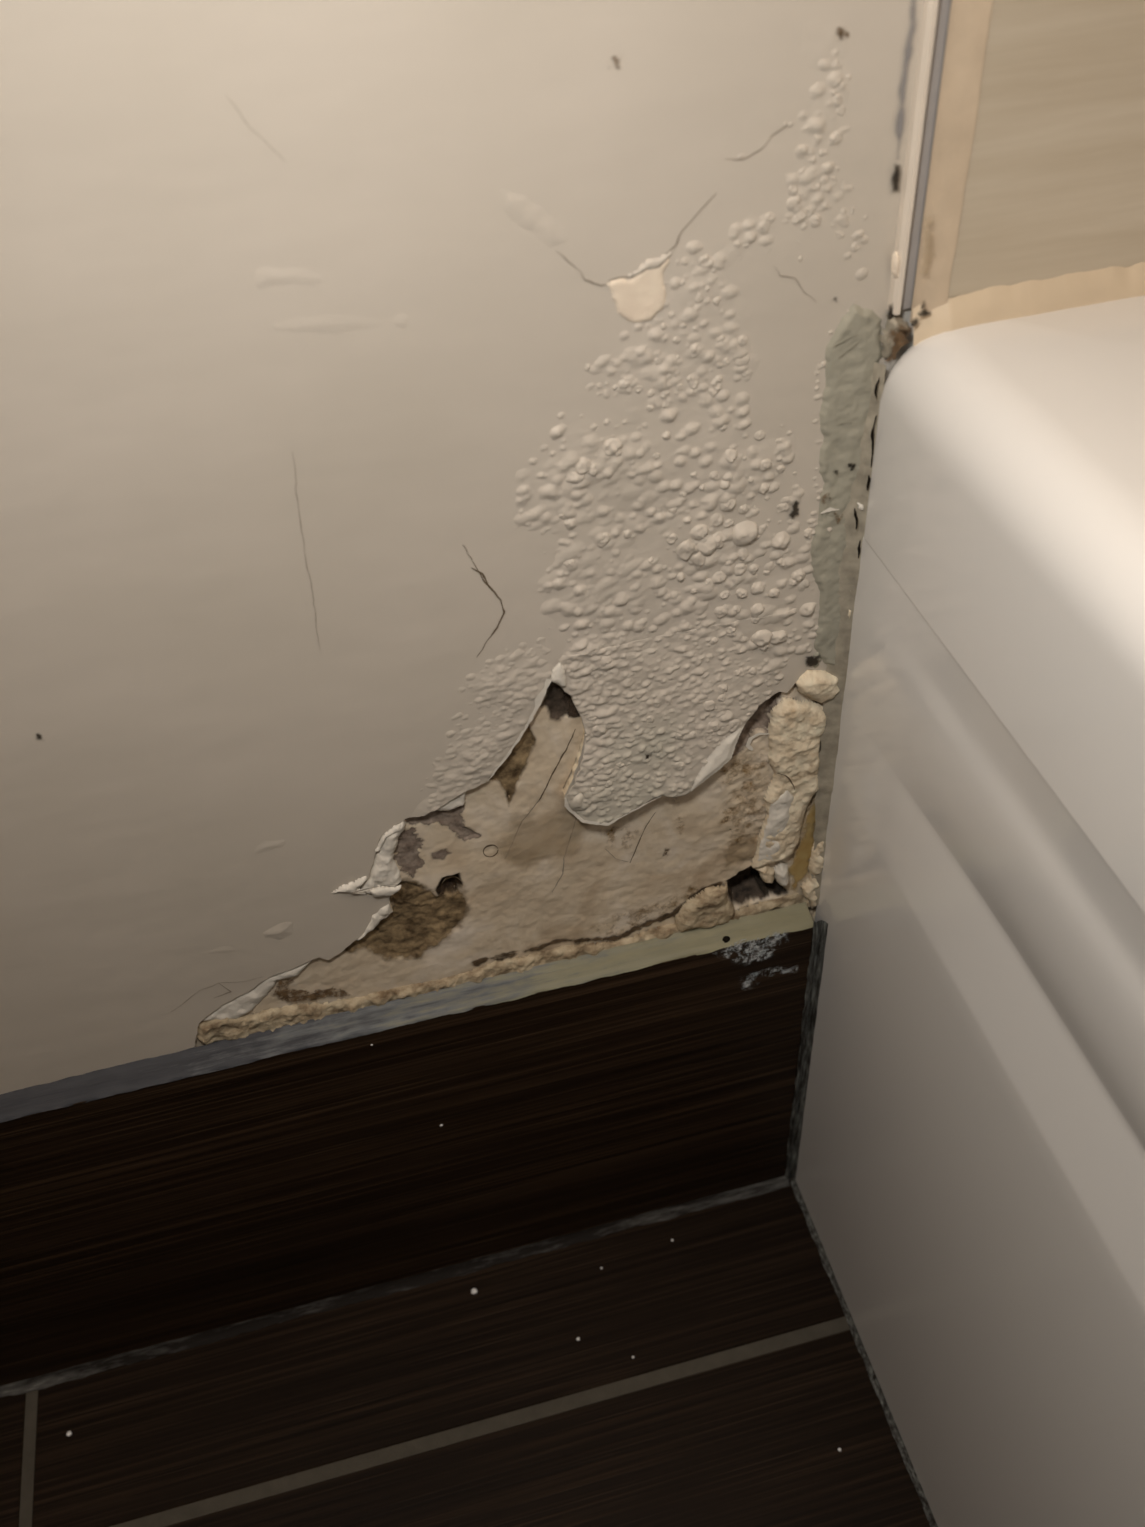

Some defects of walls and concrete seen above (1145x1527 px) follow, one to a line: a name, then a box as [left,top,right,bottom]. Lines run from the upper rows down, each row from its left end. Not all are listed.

crack [556,251,629,286]
peeling [607,249,673,323]
crack [463,545,505,657]
flaking render [195,608,840,1047]